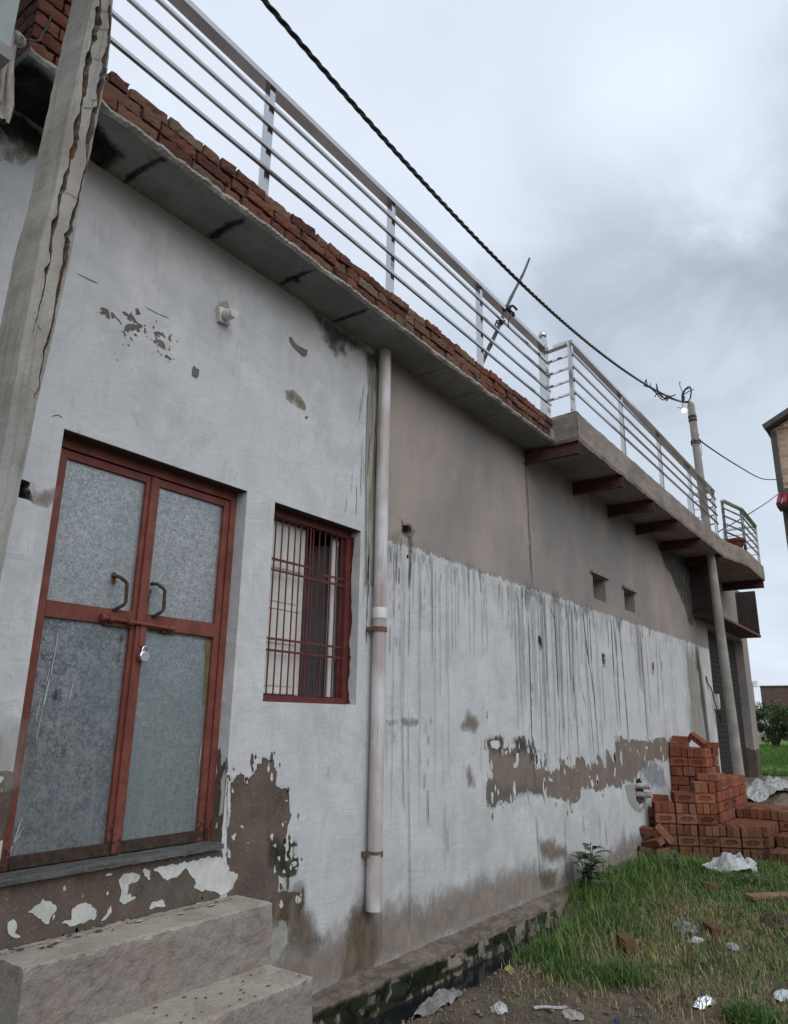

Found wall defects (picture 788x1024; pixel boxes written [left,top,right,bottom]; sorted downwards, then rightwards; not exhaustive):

crack [33,0,112,397]
peeling [100,307,178,362]
peeling [289,337,308,357]
hole [18,481,32,501]
leakage [386,535,704,828]
peeling [0,748,305,950]
leakage [272,821,645,990]
peeling [484,735,675,820]